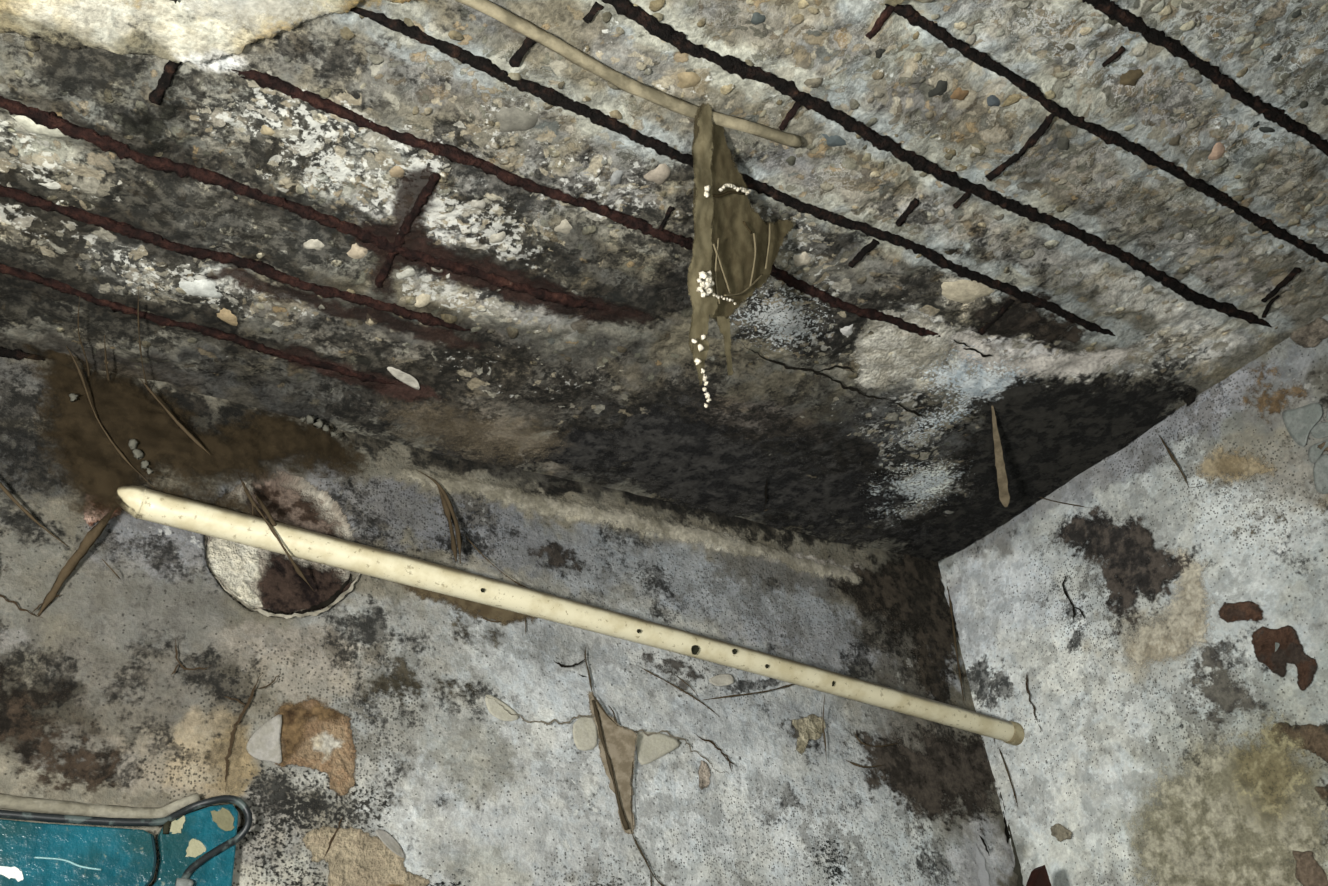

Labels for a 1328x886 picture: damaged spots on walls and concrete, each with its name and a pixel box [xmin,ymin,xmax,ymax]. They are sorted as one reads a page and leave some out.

spalling [0,0,1328,403]
corrosion [206,168,652,349]
damp [729,275,835,359]
corrosion [283,346,437,402]
damp [0,491,79,550]
damp [429,291,1193,704]
peeling [1251,625,1317,691]
damp [0,664,138,792]
peeling [246,698,356,796]
peeling [1271,722,1328,816]
damp [236,758,407,886]
peeling [302,816,430,886]